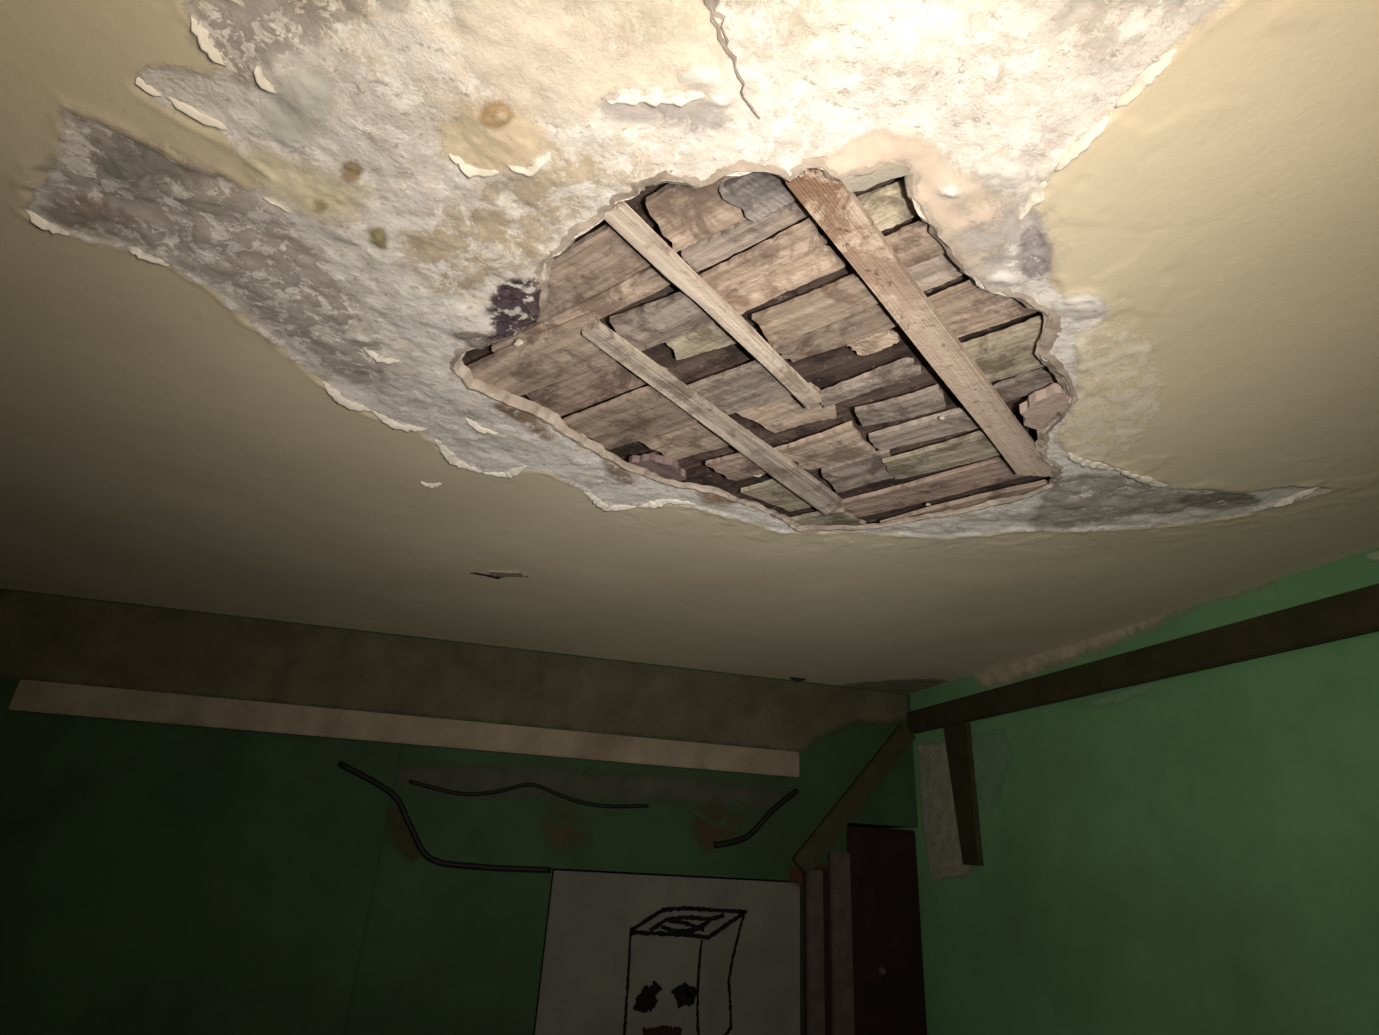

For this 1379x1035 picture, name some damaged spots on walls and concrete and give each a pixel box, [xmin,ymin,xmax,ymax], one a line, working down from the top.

crack [704,0,760,119]
water stain [46,125,384,381]
peeling [23,0,1330,538]
water stain [1030,474,1260,530]
peeling [918,741,972,881]
peeling [972,733,1010,809]